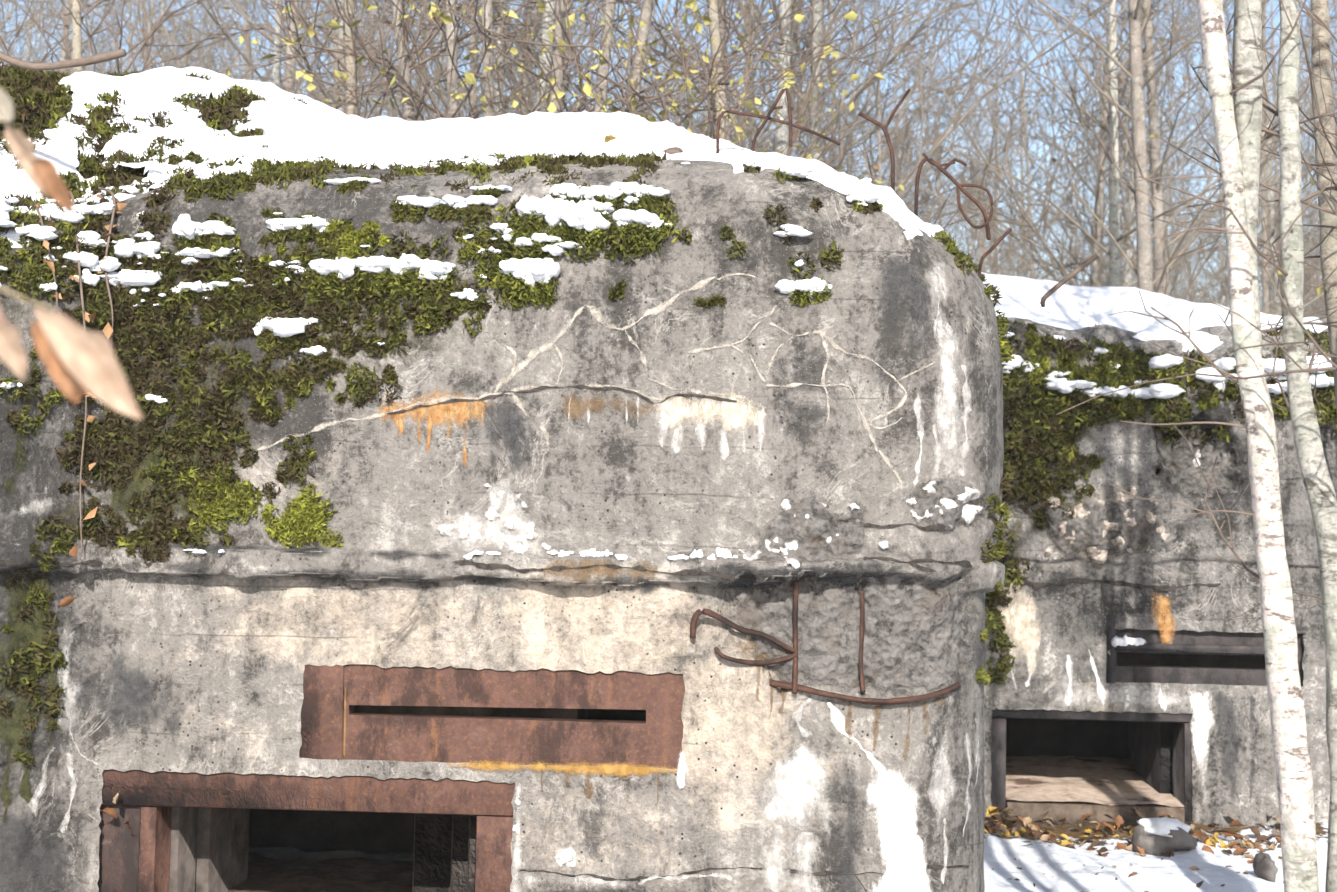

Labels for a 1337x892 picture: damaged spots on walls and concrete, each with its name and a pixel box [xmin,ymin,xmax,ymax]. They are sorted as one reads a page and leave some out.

rust [379,393,486,467]
crack [257,273,972,572]
efflorescence [659,395,764,460]
crack [454,560,772,581]
crack [1005,578,1221,614]
rust [1153,595,1174,643]
rust [744,637,787,713]
leakage [765,698,825,892]
leakage [827,702,979,892]
leakage [639,873,732,885]
crack [517,867,890,892]
crack [926,863,969,871]